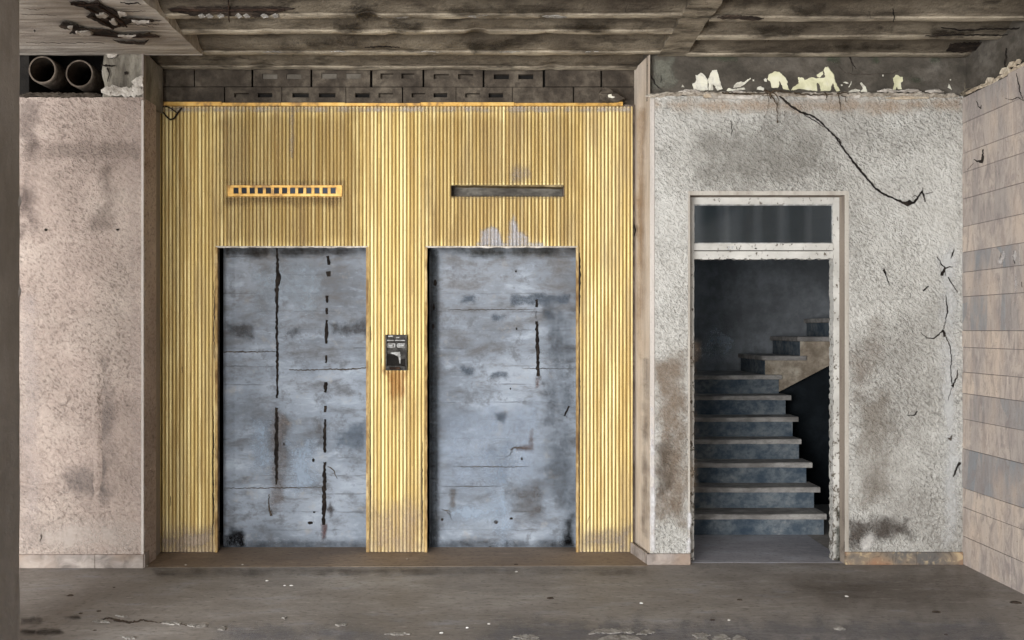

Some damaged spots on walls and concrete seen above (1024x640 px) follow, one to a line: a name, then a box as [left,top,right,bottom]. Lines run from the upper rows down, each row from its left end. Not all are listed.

spalling [59,0,295,59]
flaking render [20,75,144,98]
flaking render [645,59,1024,100]
crack [779,96,933,206]
crack [921,250,959,400]
crack [212,248,366,536]
damp [836,511,908,561]